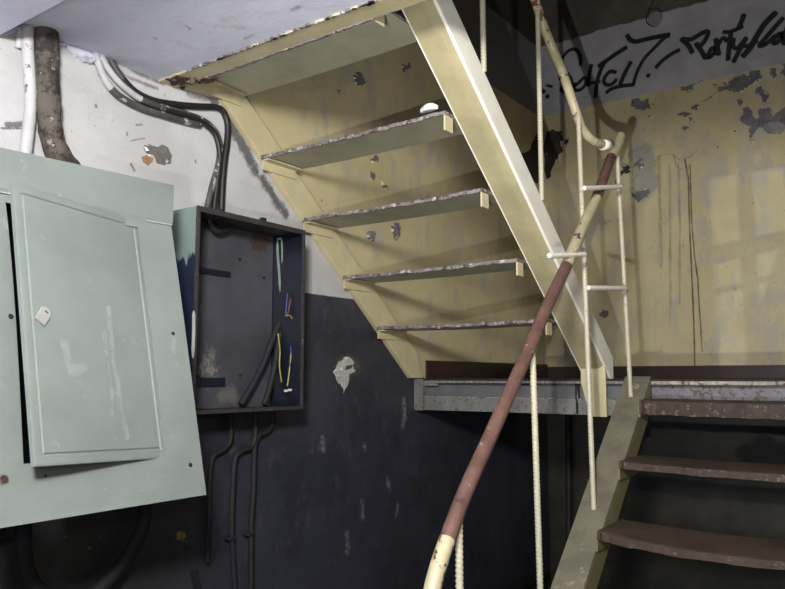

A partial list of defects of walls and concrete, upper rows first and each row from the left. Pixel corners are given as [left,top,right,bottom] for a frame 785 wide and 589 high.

peeling [205,18,375,78]
rust [165,75,214,99]
peeling [630,98,654,119]
peeling [675,62,785,146]
flaking render [142,144,172,165]
peeling [521,129,569,184]
peeling [391,222,401,241]
flaking render [332,354,363,391]